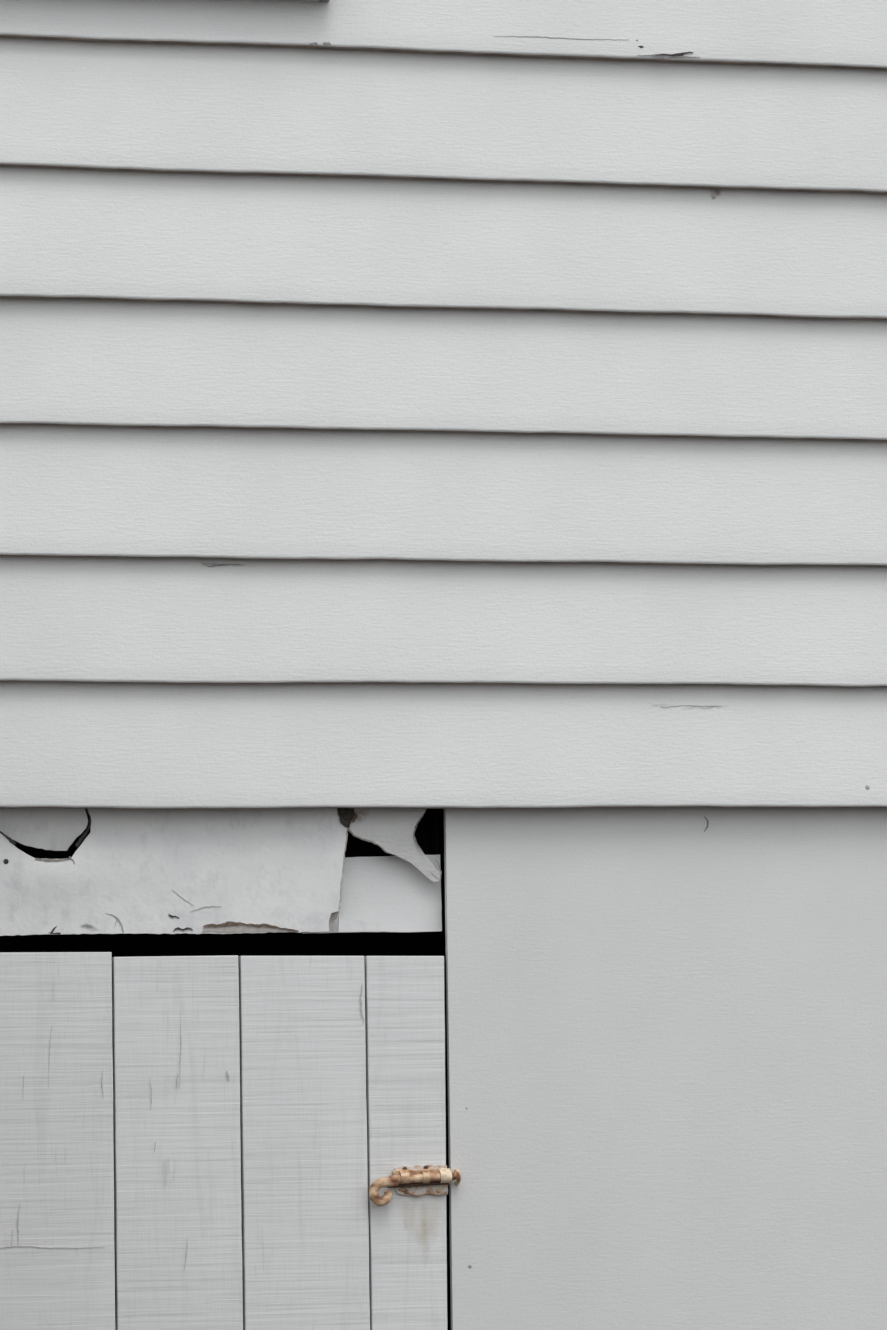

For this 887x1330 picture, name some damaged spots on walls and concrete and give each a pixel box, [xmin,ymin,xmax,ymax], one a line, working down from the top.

spalling [0,809,91,864]
spalling [413,809,439,855]
spalling [329,813,395,931]
corrosion [387,1181,449,1196]